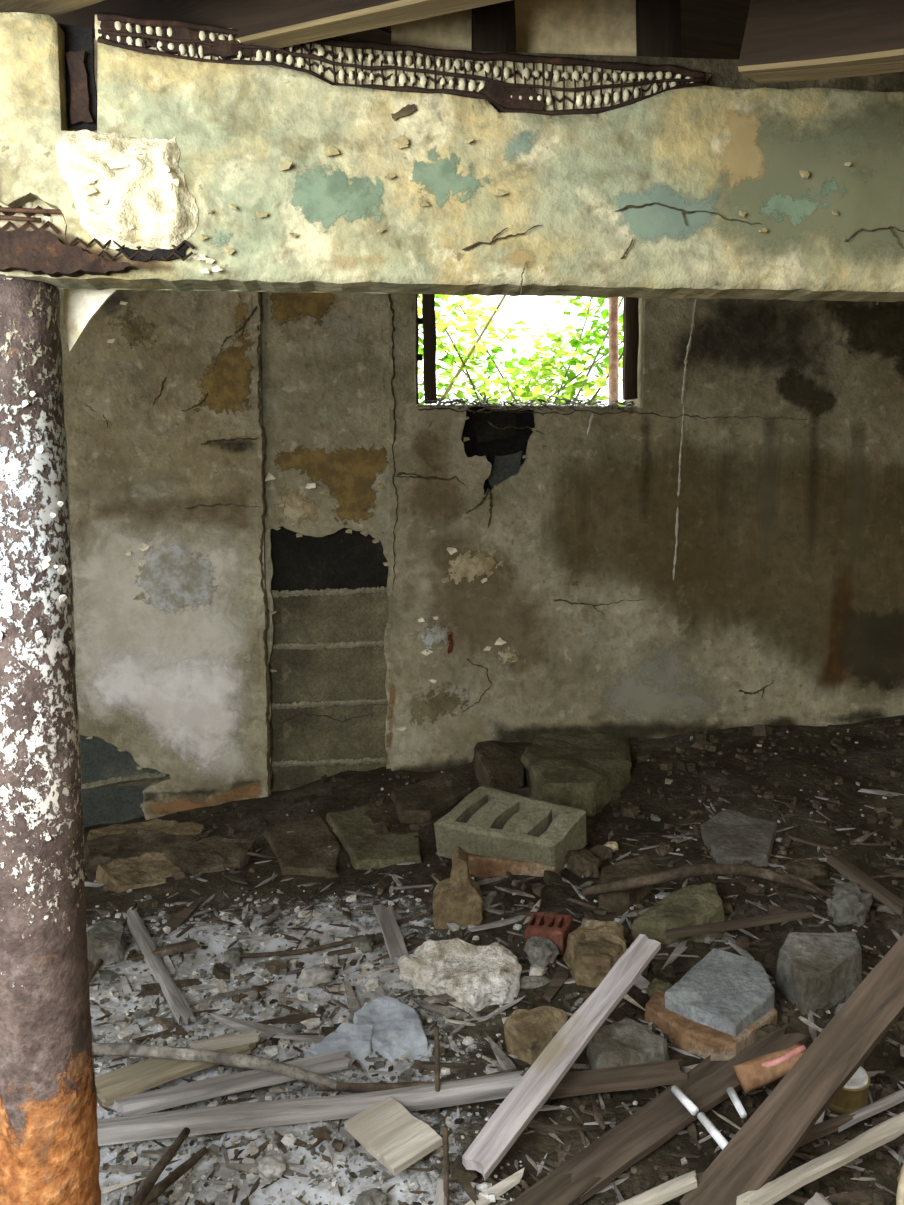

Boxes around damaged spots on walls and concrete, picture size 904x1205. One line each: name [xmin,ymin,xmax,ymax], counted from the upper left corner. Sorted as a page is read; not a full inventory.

flaking render [58,12,711,131]
peeling [278,146,396,233]
crack [615,202,761,226]
peeling [616,111,764,243]
peeling [0,199,235,939]
water stain [72,523,258,801]
flaking render [265,440,469,792]
flaking render [461,406,544,529]
crack [388,293,828,584]
water stain [497,645,719,743]
water stain [555,298,904,690]
corrosion [0,1051,101,1205]